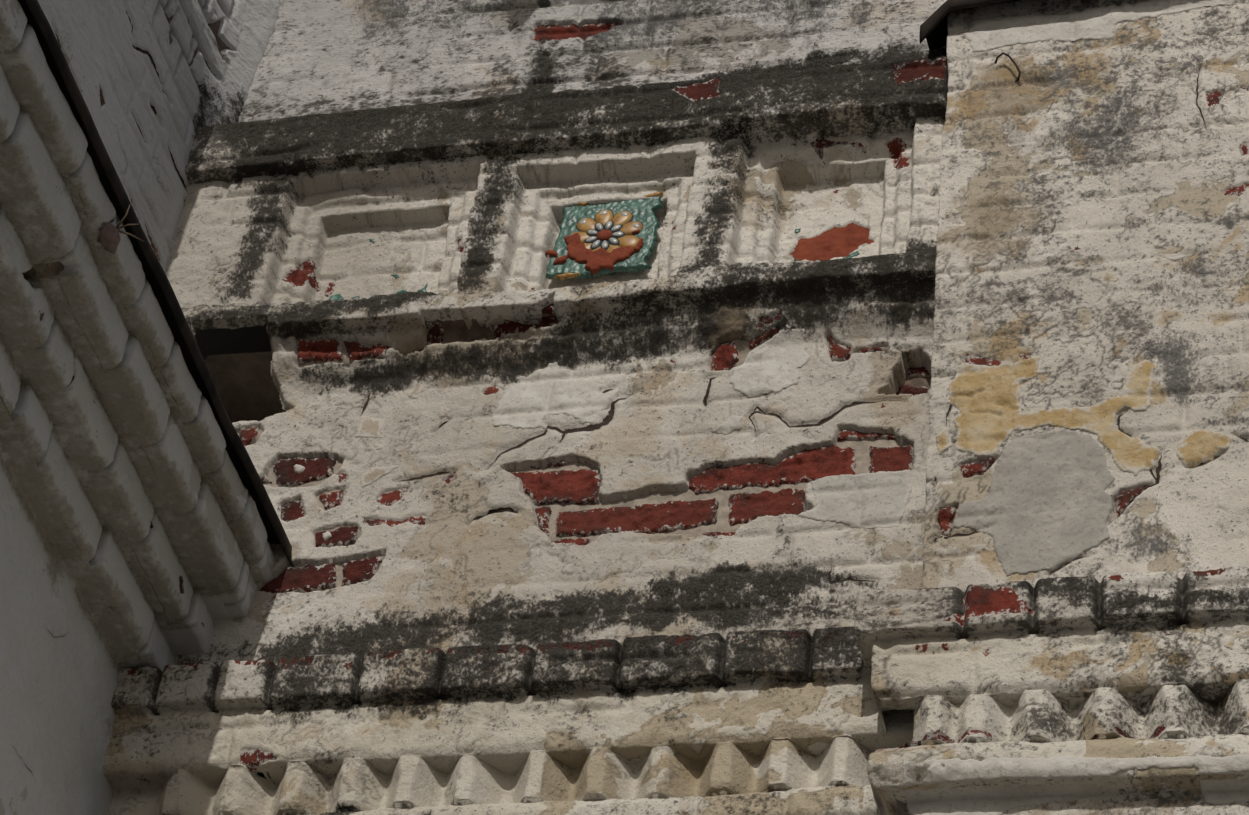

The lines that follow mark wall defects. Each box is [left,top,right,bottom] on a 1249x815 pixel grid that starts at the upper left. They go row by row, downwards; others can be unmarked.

water stain [186,0,948,399]
flaking render [790,223,875,262]
crack [488,389,633,467]
crack [703,376,718,406]
crack [748,400,906,435]
spalling [261,458,348,522]
spalling [260,487,426,593]
crack [399,472,451,482]
crack [468,507,519,525]
spalling [507,430,914,546]
spalling [1110,485,1150,524]
water stain [240,559,884,728]